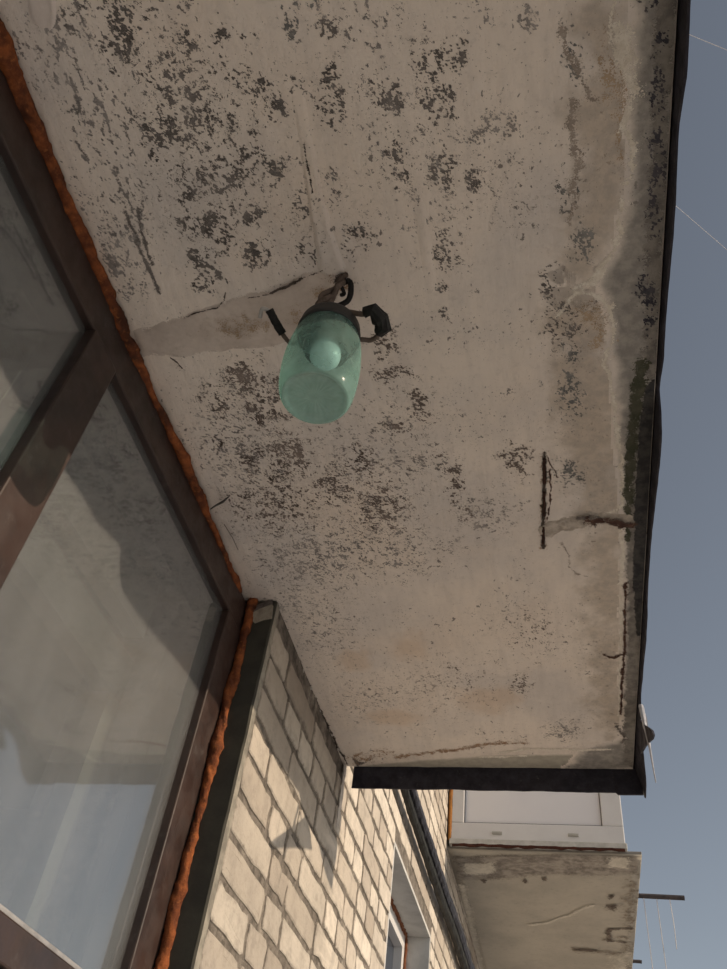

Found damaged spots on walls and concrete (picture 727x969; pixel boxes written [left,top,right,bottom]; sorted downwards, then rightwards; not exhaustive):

crack [186,292,226,317]
crack [249,270,323,298]
damp [340,0,677,769]
damp [319,619,443,680]
corrosion [602,582,628,715]